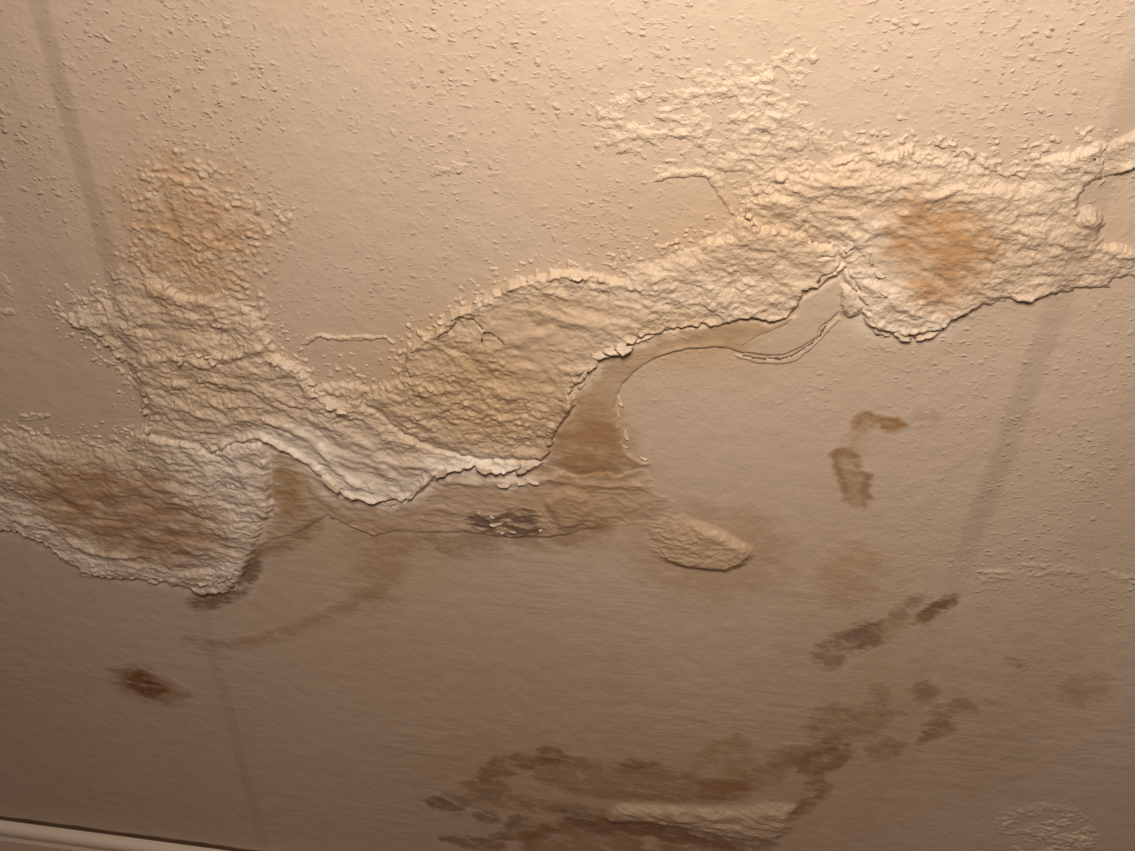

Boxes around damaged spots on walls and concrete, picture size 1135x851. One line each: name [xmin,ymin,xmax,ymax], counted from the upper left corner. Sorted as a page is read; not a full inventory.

crack [743,319,832,361]
leakage [811,203,981,352]
spalling [462,505,552,535]
leakage [0,315,1135,851]